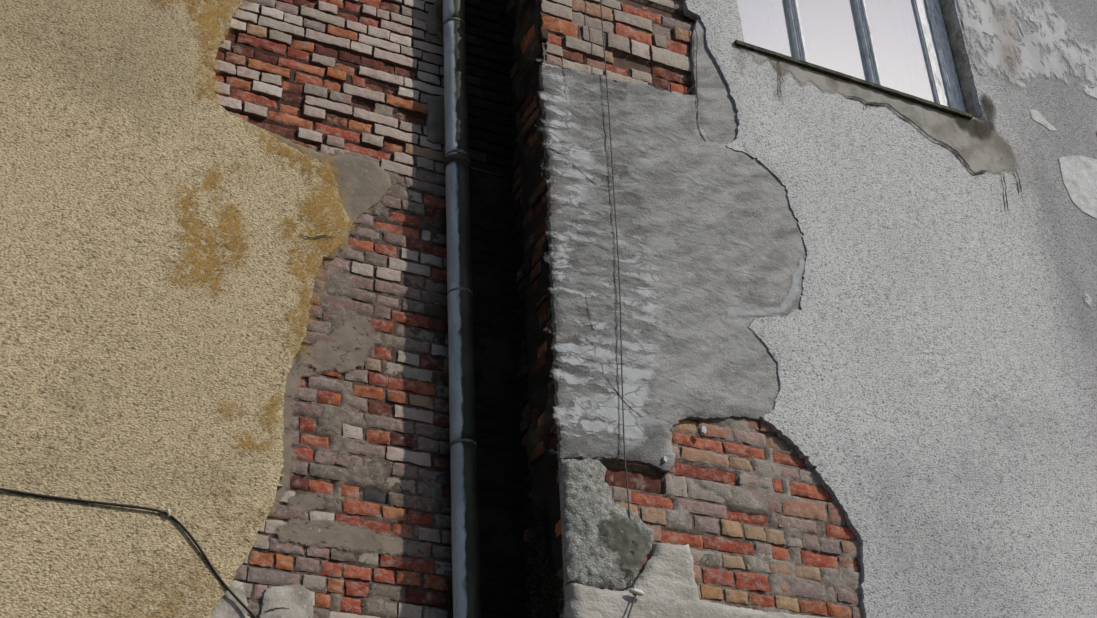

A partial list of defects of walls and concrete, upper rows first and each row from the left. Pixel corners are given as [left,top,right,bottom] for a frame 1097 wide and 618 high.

water stain [174,169,248,295]
spalling [210,0,453,618]
spalling [465,0,529,618]
spalling [536,0,738,447]
peeling [958,0,1097,98]
peeling [1030,110,1057,130]
peeling [1059,156,1097,218]
spalling [576,417,864,618]